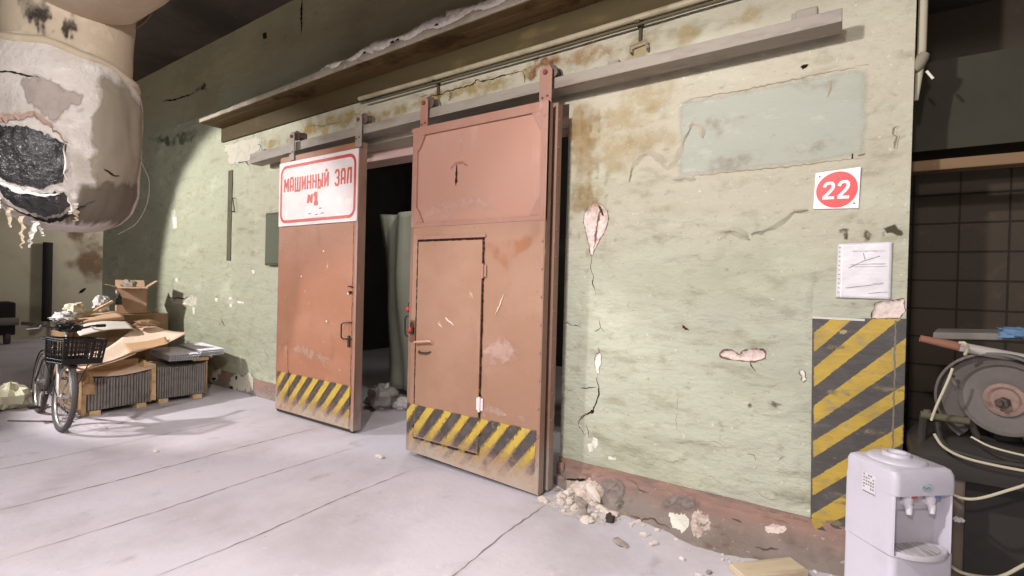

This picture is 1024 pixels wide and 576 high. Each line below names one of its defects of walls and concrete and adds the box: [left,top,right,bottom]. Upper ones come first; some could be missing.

peeling [21,76,82,121]
crack [420,66,532,100]
spalling [583,202,609,294]
spalling [871,298,906,319]
spalling [719,348,766,368]
crack [563,321,670,529]
spalling [566,477,604,502]
spalling [669,509,711,539]